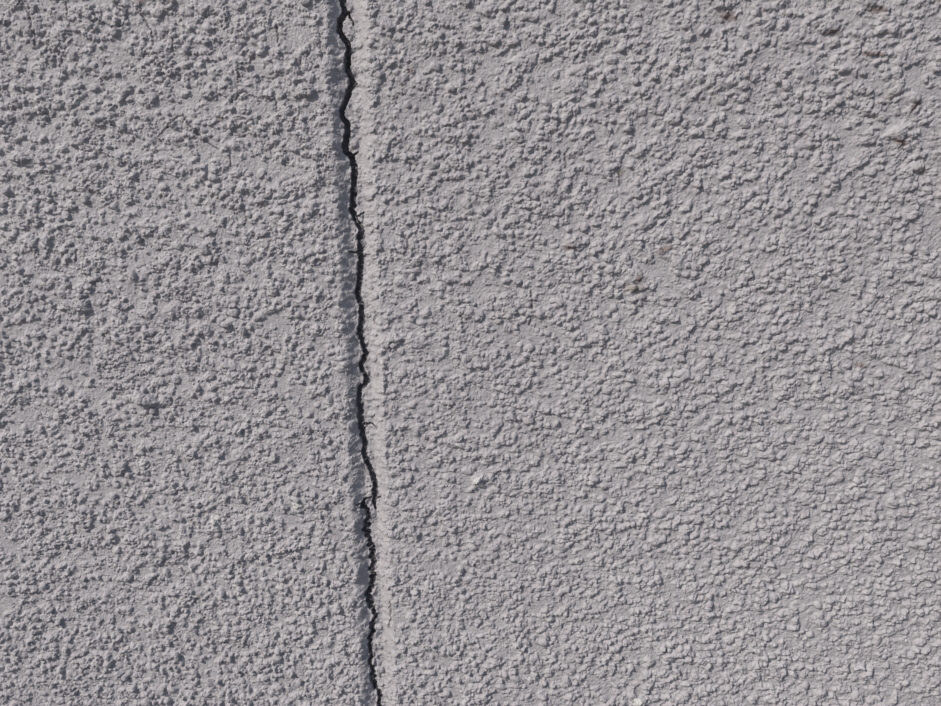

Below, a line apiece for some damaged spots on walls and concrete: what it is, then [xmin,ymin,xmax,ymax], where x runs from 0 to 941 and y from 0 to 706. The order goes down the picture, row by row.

crack [336,0,392,706]